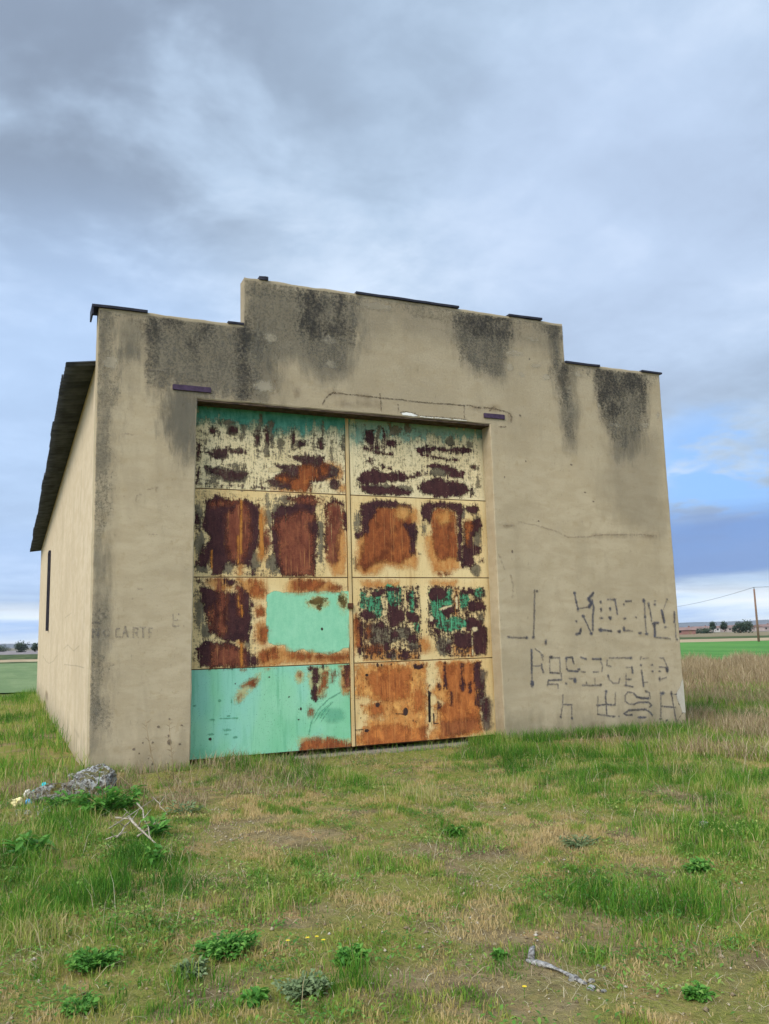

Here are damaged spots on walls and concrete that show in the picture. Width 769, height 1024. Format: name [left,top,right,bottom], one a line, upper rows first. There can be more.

rust [193,453,484,751]
peeling [195,411,491,731]